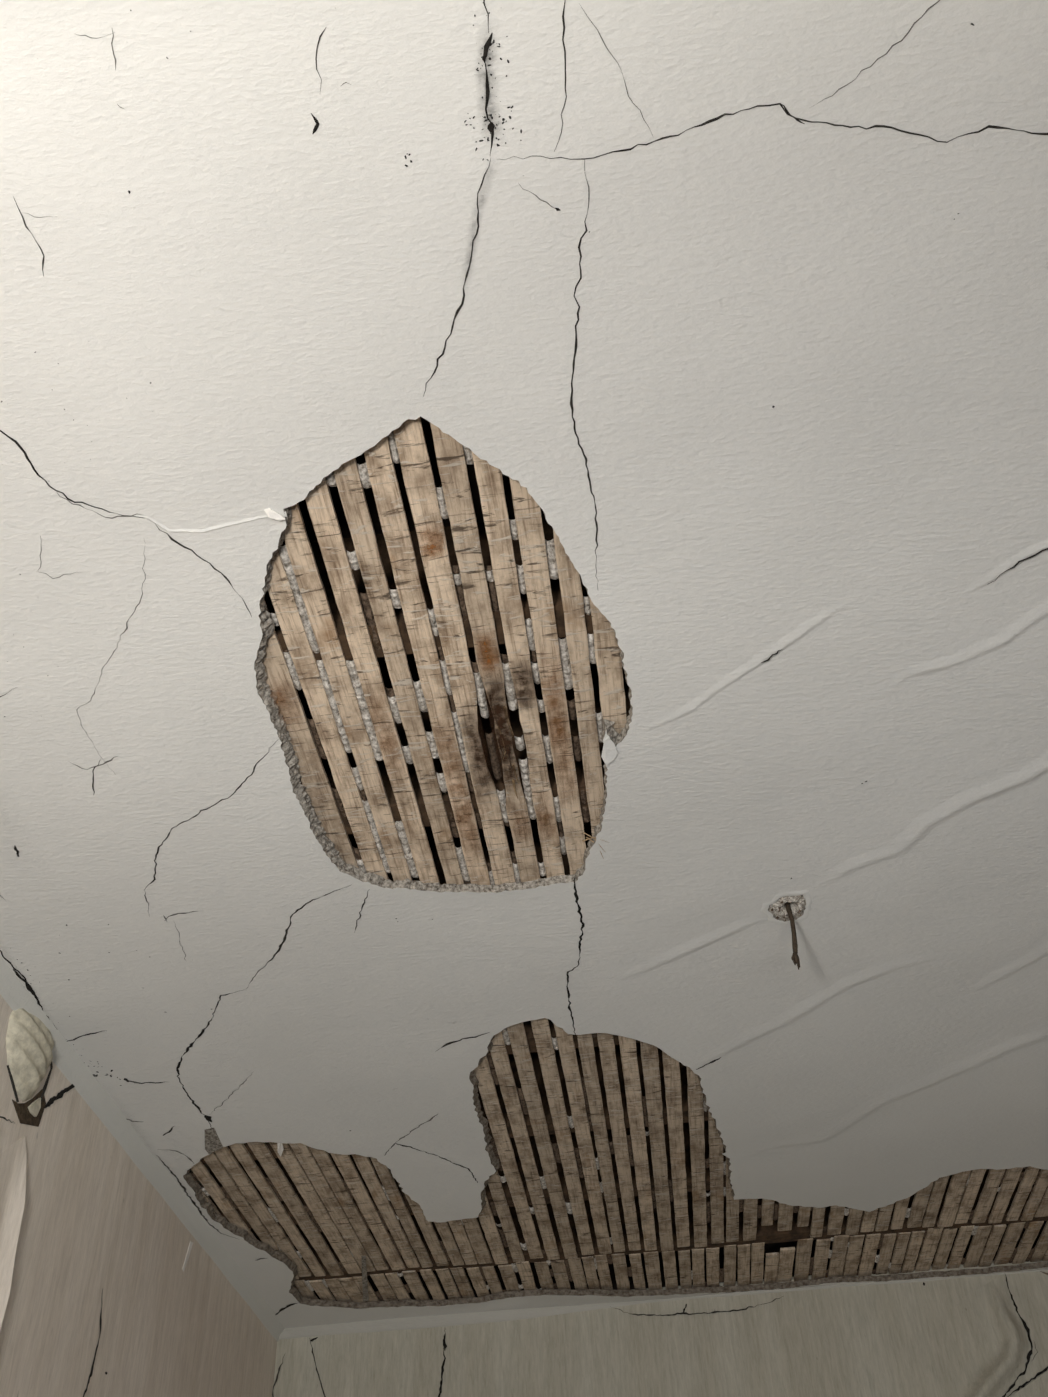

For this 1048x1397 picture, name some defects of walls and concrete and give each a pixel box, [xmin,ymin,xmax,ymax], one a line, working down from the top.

crack [311,28,349,134]
crack [423,0,1048,588]
flaking render [307,472,337,496]
flaking render [373,431,400,464]
flaking render [463,446,474,464]
crack [0,430,252,795]
flaking render [254,506,633,893]
crack [0,950,107,1041]
crack [144,743,275,959]
crack [124,887,369,1260]
crack [566,878,585,1035]
flaking render [183,1028,1048,1309]